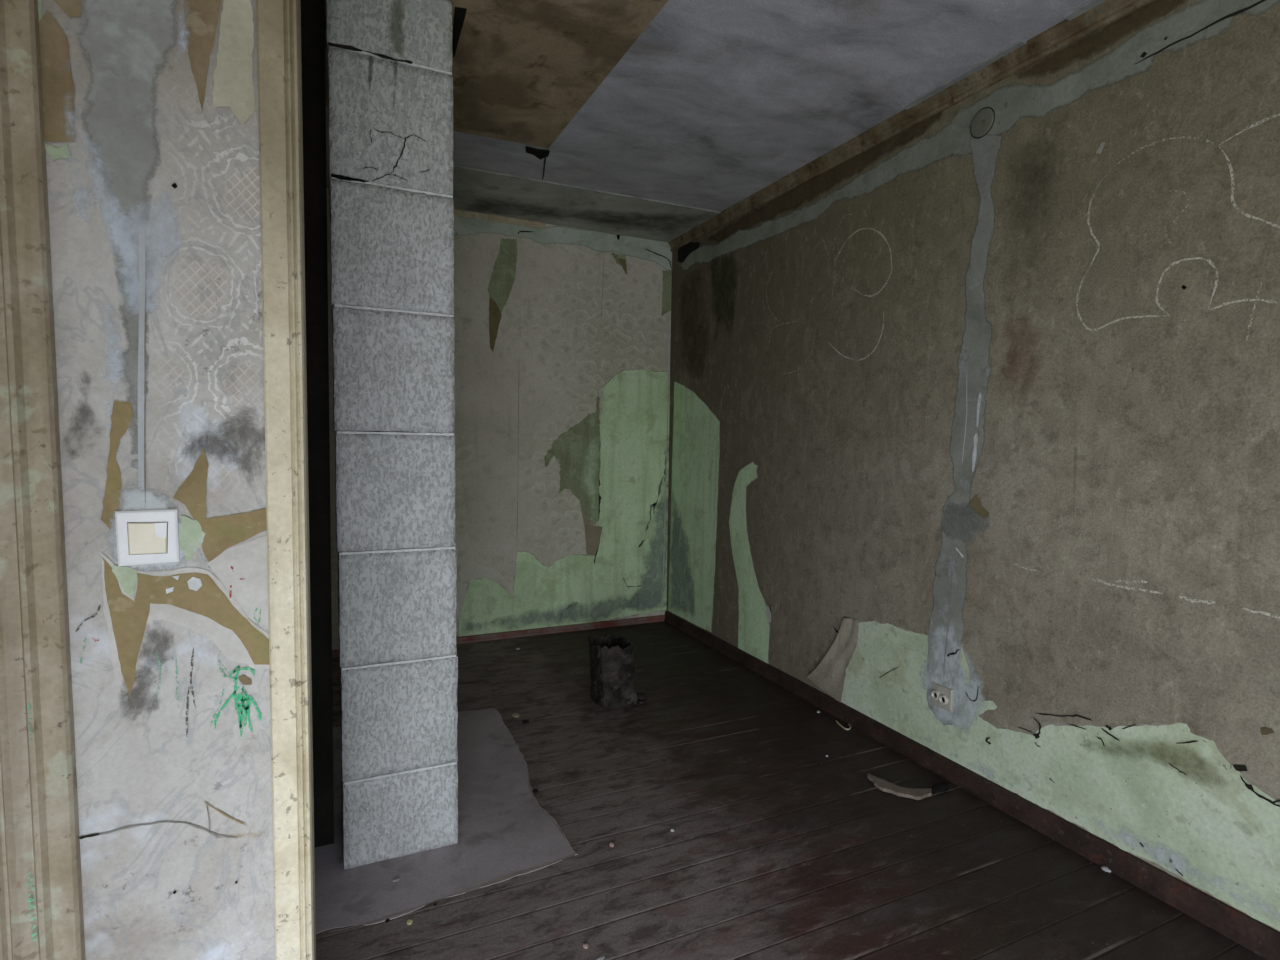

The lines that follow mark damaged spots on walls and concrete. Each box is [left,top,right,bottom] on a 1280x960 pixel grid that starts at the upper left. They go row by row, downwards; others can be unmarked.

spalling [327,42,413,64]
crack [363,127,430,181]
peeling [38,0,270,700]
peeling [454,0,1279,664]
damp [502,450,694,624]
peeling [841,620,1280,930]